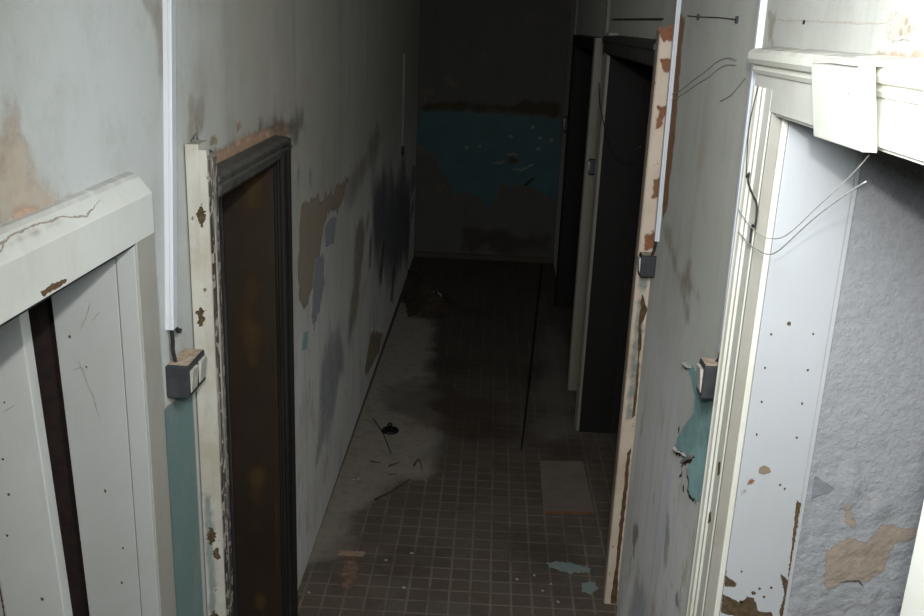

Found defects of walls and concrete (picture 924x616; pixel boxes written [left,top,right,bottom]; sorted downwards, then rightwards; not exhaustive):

crack [0,200,100,252]
flaking render [296,162,349,350]
peeling [672,361,713,504]
peeling [811,476,835,500]
peeling [721,501,801,616]
peeling [823,505,916,591]